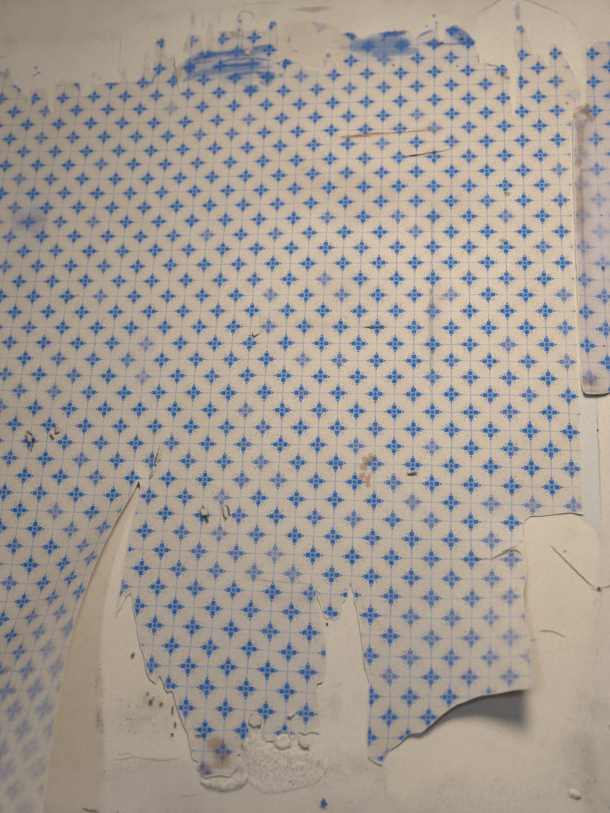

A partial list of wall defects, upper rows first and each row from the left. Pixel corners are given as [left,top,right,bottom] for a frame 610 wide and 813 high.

peeling [0,5,280,112]
peeling [419,0,586,115]
flaking render [0,479,198,813]
flaking render [199,512,603,813]